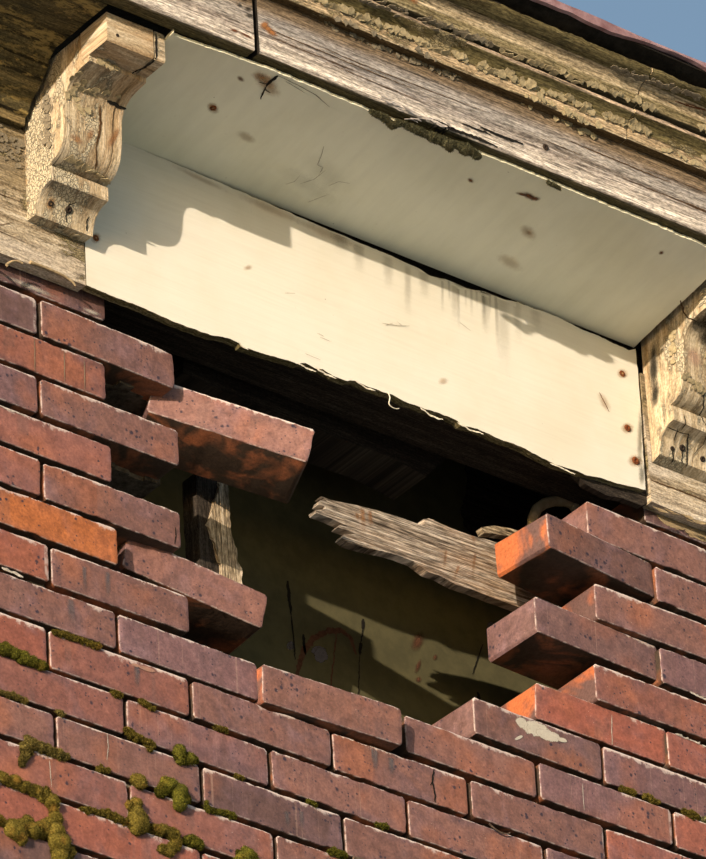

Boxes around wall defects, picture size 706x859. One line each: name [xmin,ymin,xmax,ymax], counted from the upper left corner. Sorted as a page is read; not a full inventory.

crack [132,34,158,74]
peeling [313,0,658,140]
crack [95,100,126,170]
peeling [661,147,706,178]
flaking render [460,465,571,542]